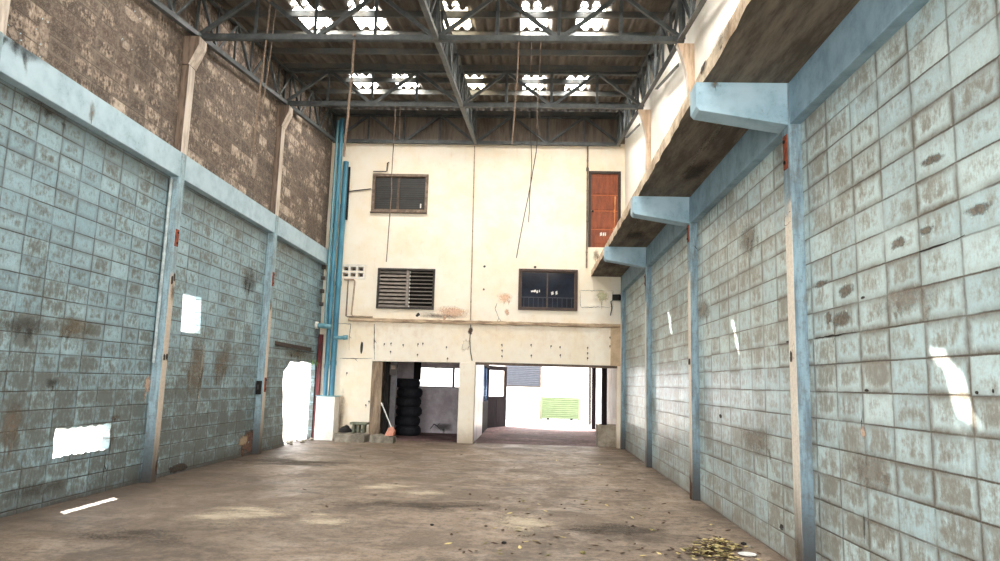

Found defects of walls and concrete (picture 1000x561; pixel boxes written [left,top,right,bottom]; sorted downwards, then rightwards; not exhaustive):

damp [187,351,203,395]